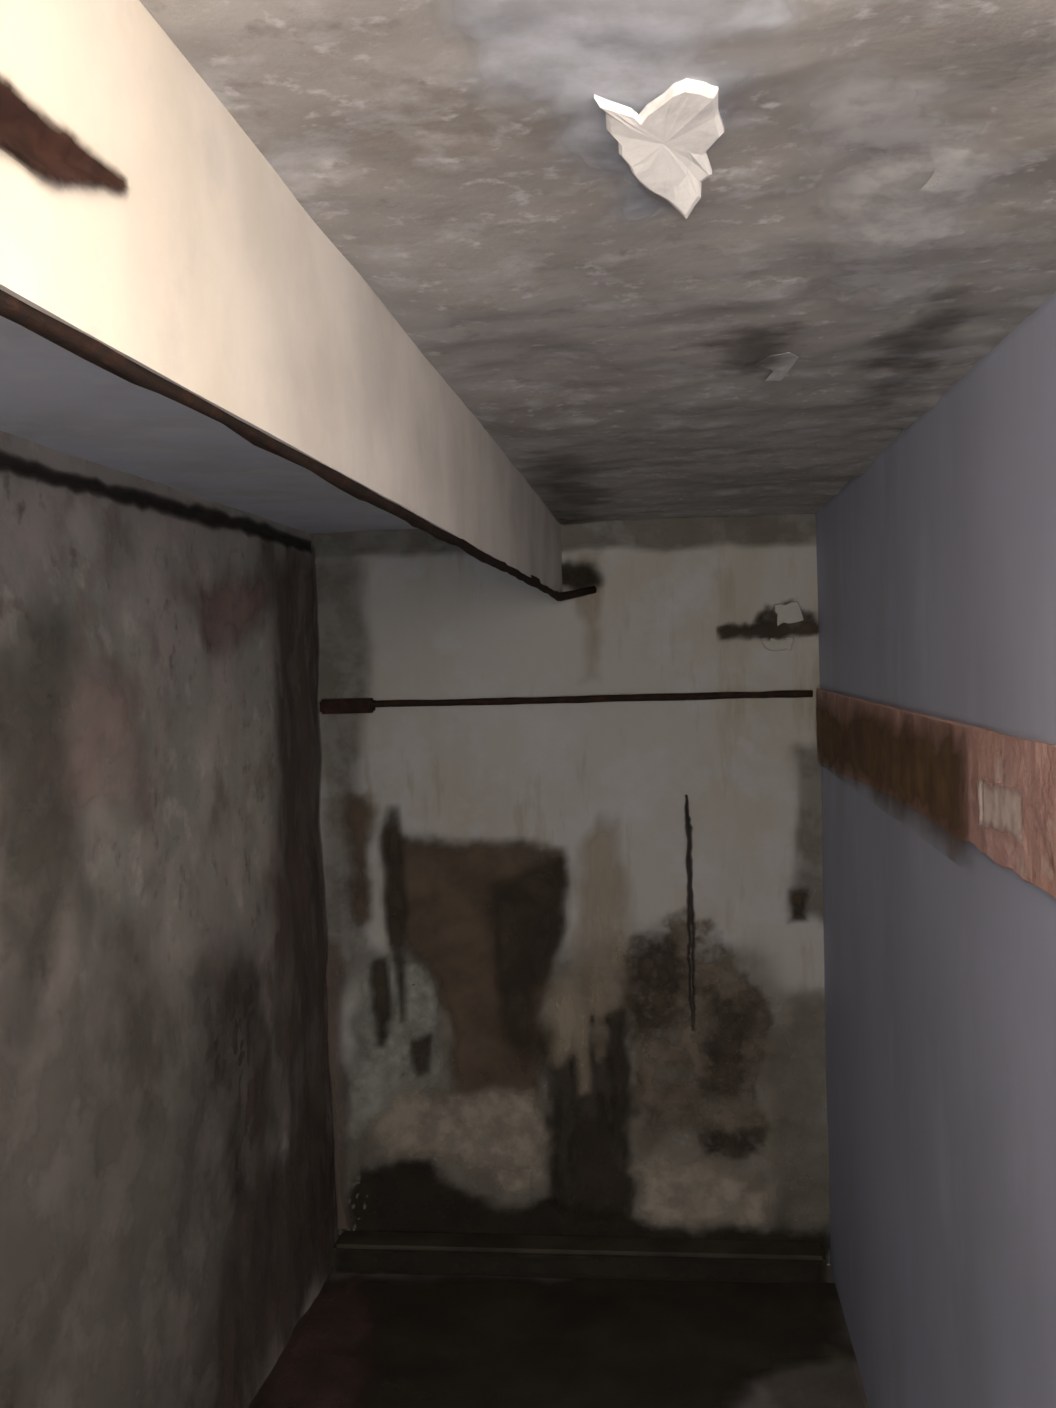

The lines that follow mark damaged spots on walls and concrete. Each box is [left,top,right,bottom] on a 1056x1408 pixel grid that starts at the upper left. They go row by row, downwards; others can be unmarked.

peeling [463,0,785,219]
damp [544,472,817,565]
spalling [717,601,819,651]
spalling [816,689,1056,899]
damp [0,529,853,1408]
crack [685,795,695,1031]